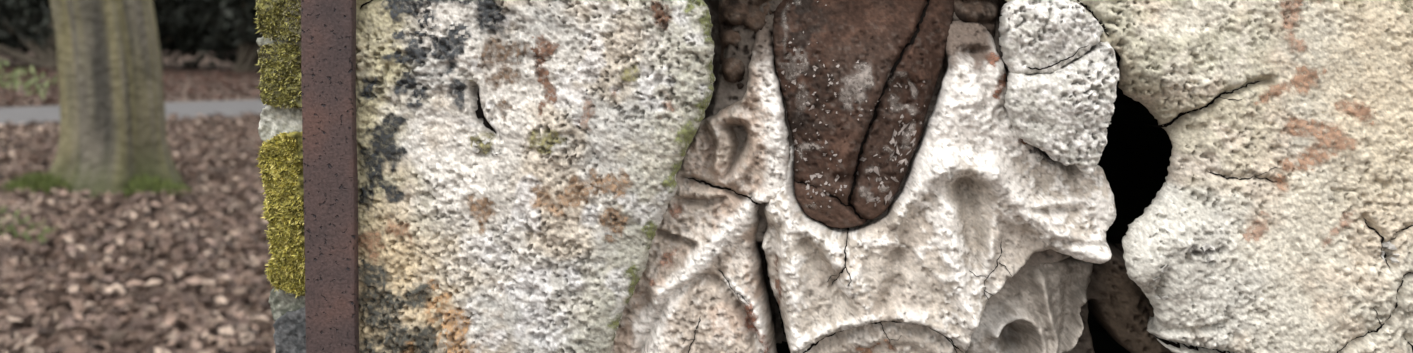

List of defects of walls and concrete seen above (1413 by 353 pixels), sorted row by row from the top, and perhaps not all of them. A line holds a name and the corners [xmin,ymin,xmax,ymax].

crack [794,0,930,286]
crack [1149,81,1260,128]
crack [1152,334,1230,353]
crack [1337,218,1413,353]